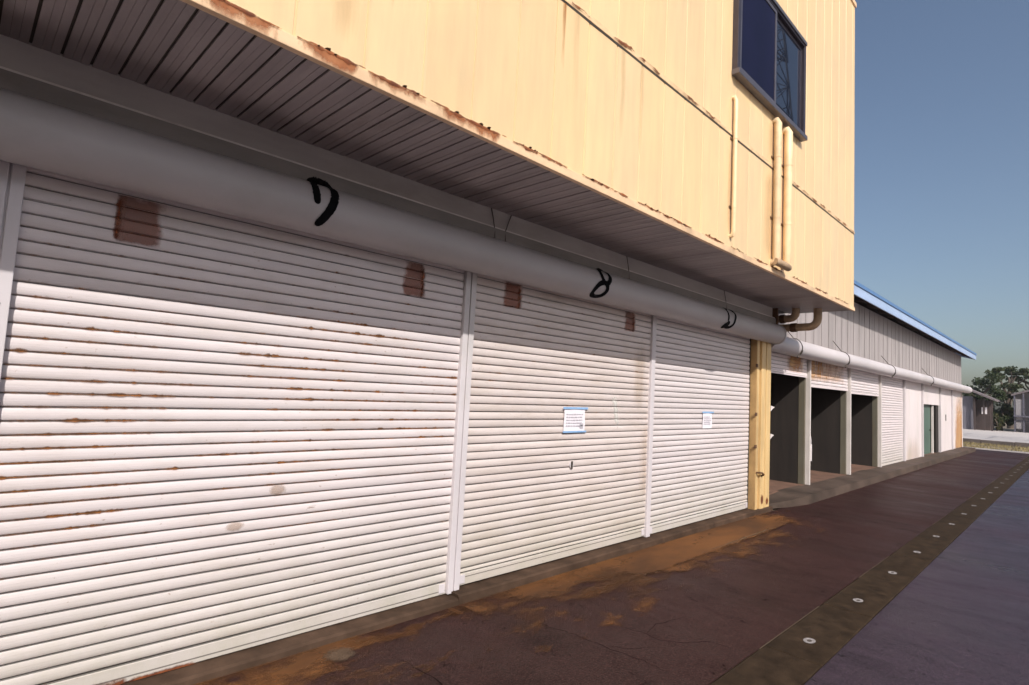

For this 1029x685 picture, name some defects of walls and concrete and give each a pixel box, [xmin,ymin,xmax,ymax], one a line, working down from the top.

rust [210,0,279,29]
rust [297,36,566,167]
rust [114,195,161,245]
rust [583,174,691,228]
rust [403,262,425,305]
rust [504,282,530,308]
rust [624,312,634,331]
rust [0,317,204,543]
rust [196,308,457,527]
rust [104,663,194,685]